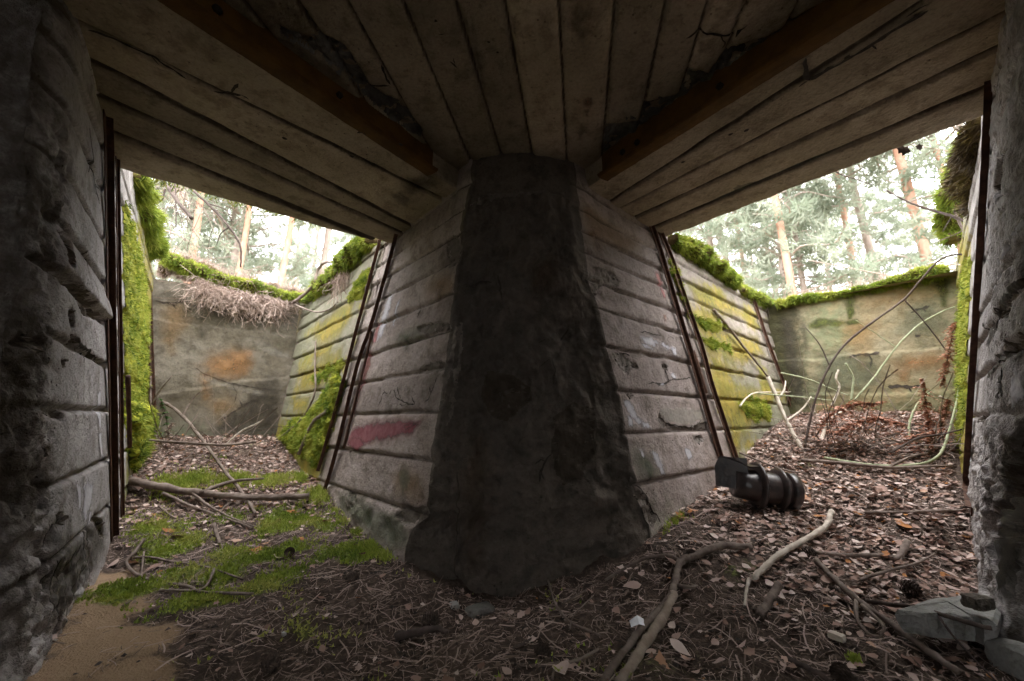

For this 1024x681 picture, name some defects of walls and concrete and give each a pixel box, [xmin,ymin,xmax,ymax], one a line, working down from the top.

crack [686,21,745,47]
spalling [603,15,800,151]
crack [622,353,690,386]
crack [659,417,706,430]